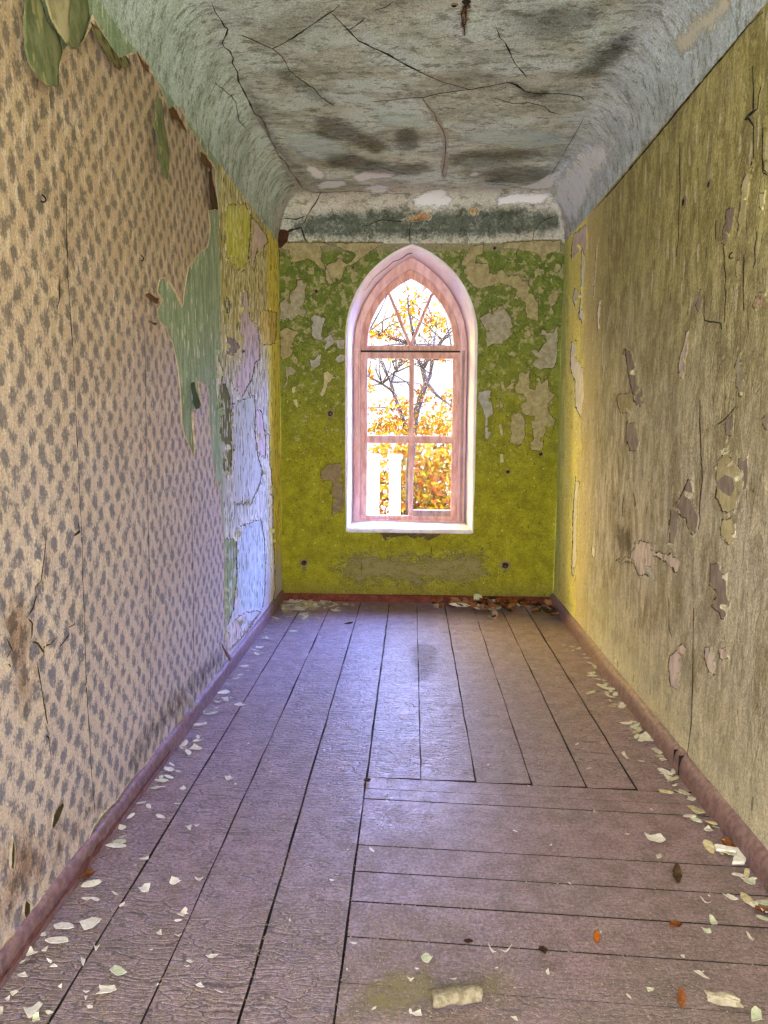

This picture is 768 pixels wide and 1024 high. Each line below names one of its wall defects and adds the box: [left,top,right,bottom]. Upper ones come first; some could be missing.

rust [461,0,471,36]
leakage [313,117,428,174]
crack [211,1,585,288]
crack [594,12,763,257]
crack [744,66,767,175]
leakage [291,206,560,239]
crack [704,221,757,329]
peeling [459,222,602,465]
spalling [380,533,442,542]
peeling [615,476,699,581]
peeling [714,412,749,547]
peeling [562,644,627,708]